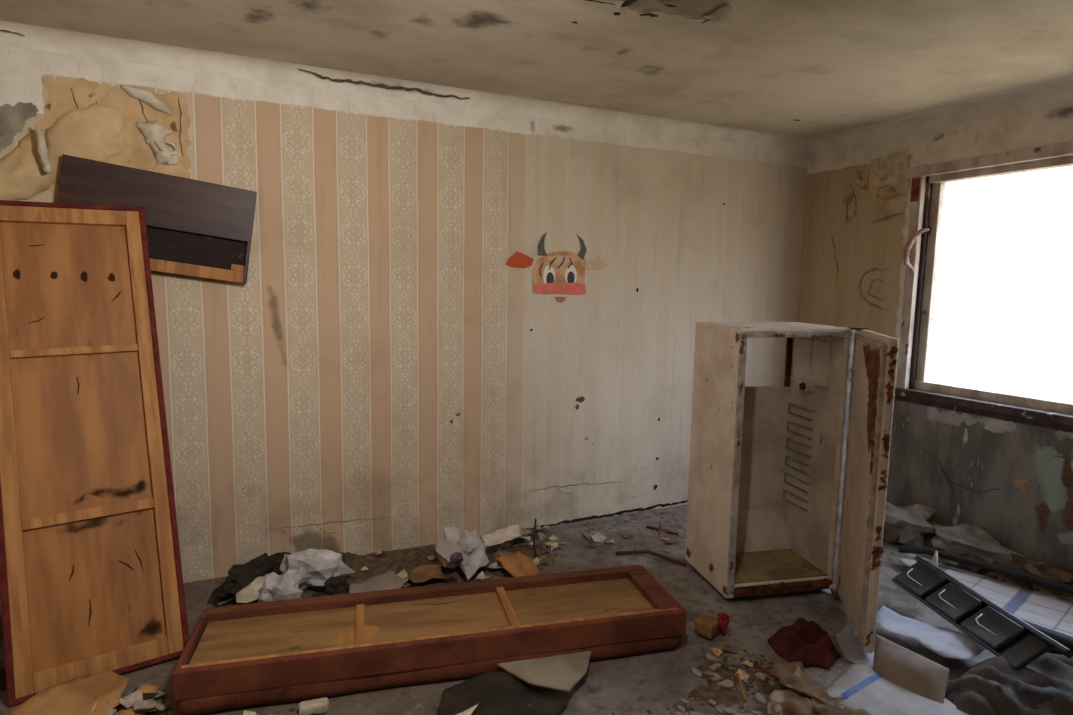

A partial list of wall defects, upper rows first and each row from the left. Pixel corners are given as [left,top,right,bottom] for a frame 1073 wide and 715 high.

peeling [585,0,733,23]
crack [298,69,470,99]
peeling [0,76,191,203]
peeling [910,177,921,202]
peeling [1035,446,1073,513]
rust [1061,460,1073,529]